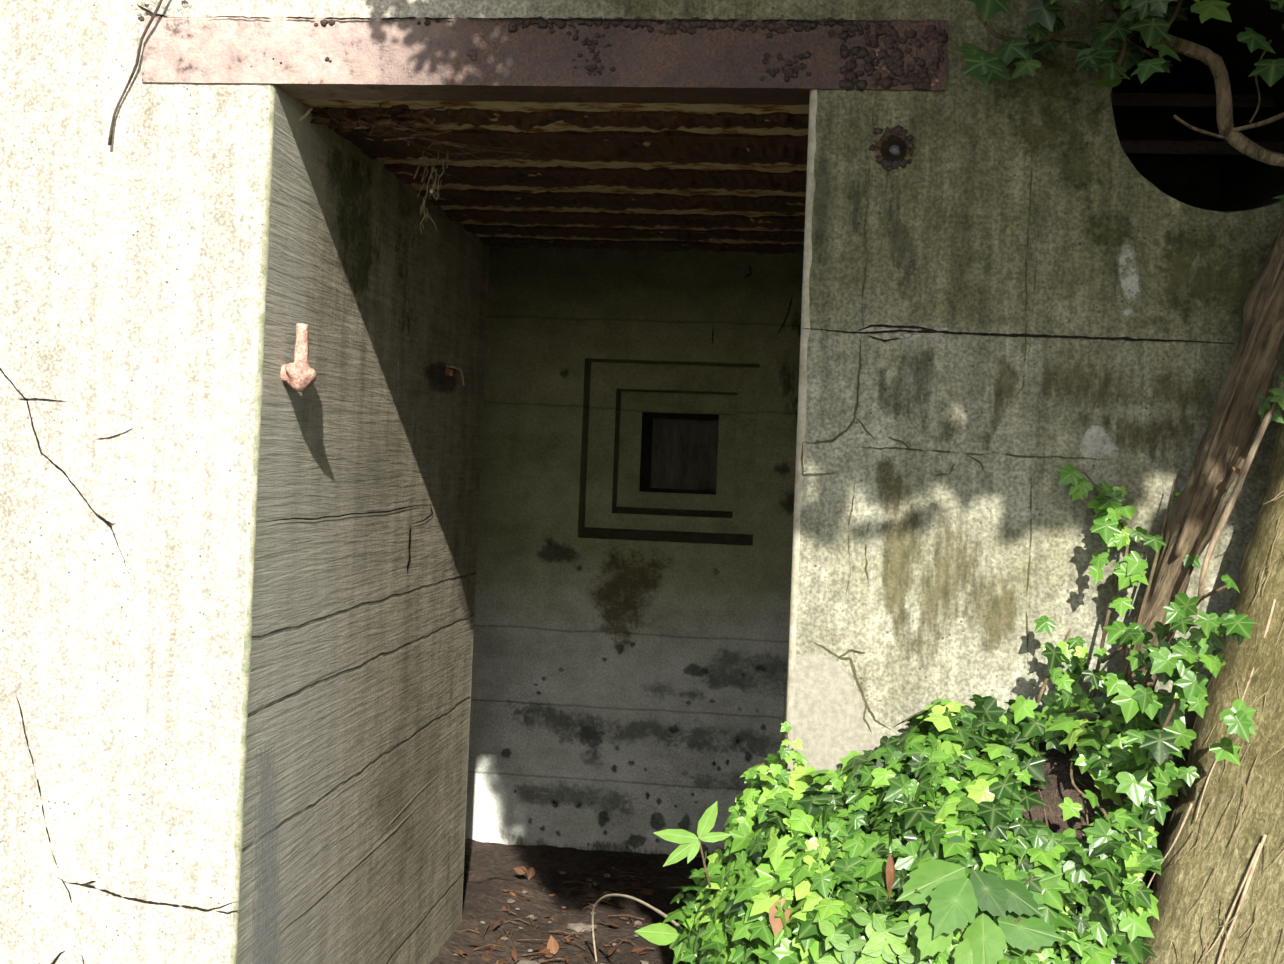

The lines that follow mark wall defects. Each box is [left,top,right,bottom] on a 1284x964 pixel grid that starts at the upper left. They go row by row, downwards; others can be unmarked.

spalling [130,0,192,21]
leakage [814,159,827,261]
leakage [879,352,934,416]
crack [778,94,1234,670]
crack [0,368,129,574]
crack [258,505,433,573]
leakage [869,459,1014,652]
crack [814,642,892,731]
crack [4,678,240,914]